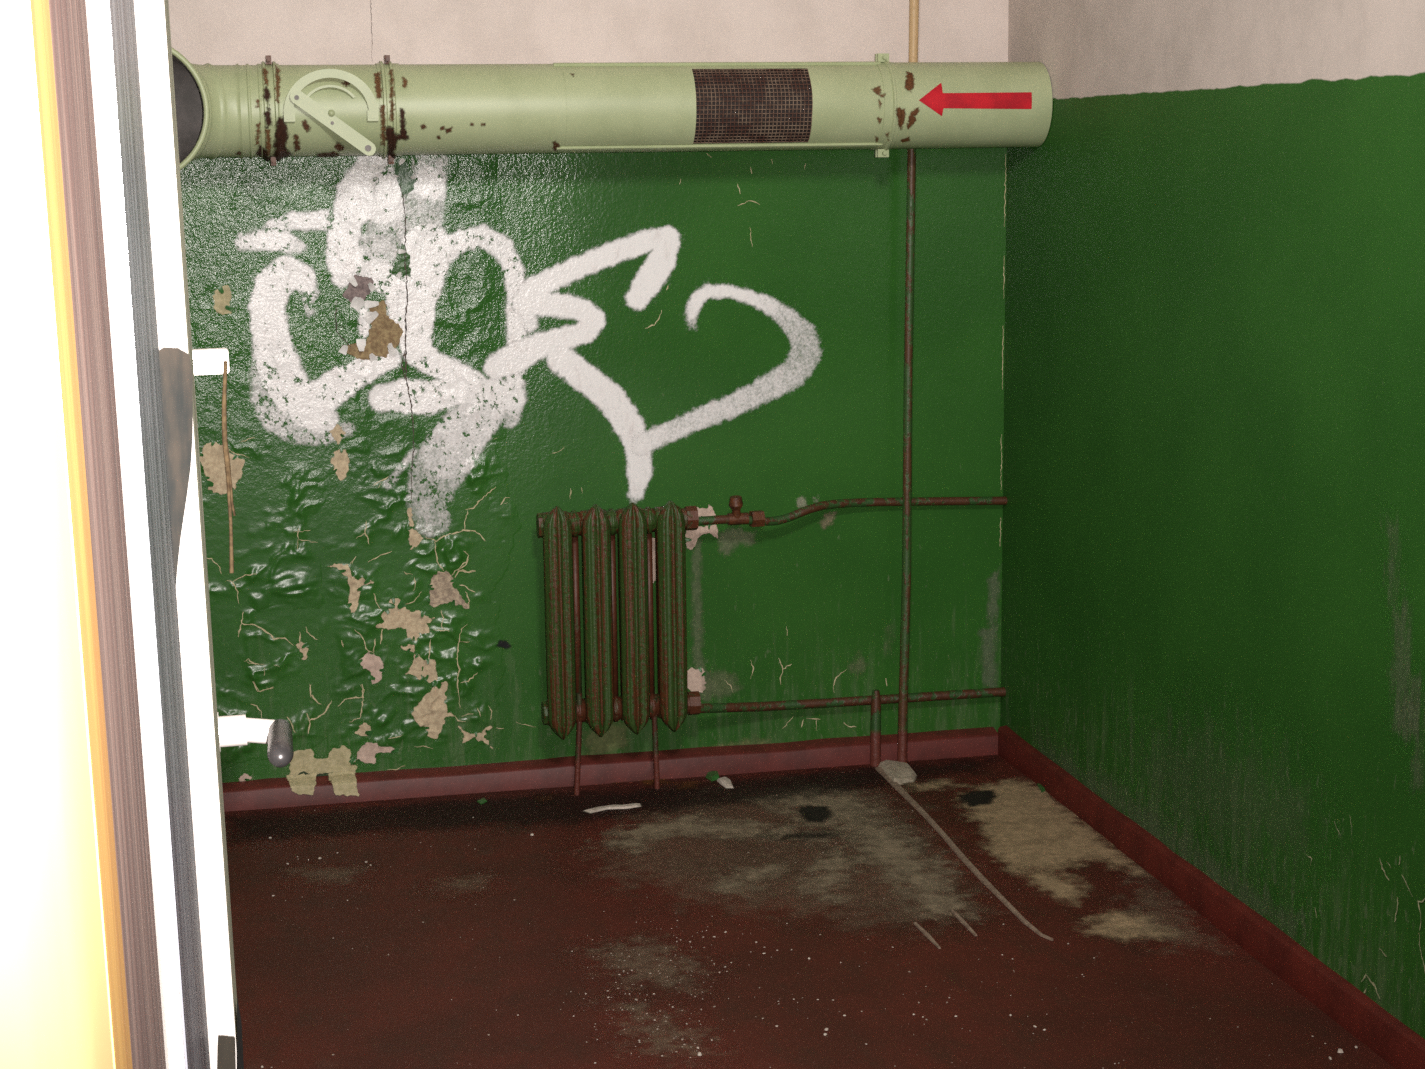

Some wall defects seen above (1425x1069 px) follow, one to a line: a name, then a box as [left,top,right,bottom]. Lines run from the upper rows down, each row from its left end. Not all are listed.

peeling [391,243,411,279]
peeling [338,275,403,362]
crack [373,186,415,499]
peeling [200,440,245,495]
peeling [685,505,718,550]
peeling [328,564,374,613]
crack [207,487,533,734]
peeling [357,652,385,684]
peeling [376,571,493,749]
peeling [687,666,706,693]
crack [298,770,333,778]
peeling [286,723,399,796]